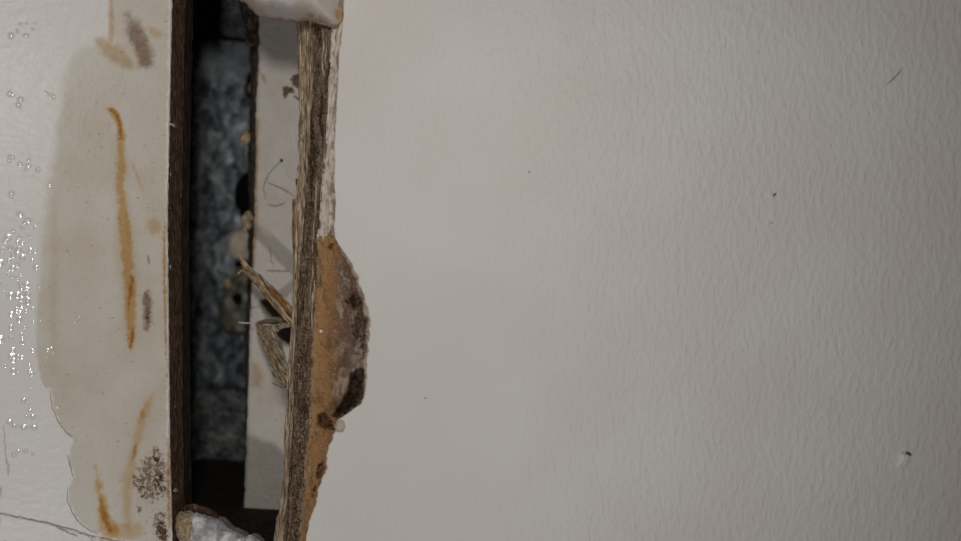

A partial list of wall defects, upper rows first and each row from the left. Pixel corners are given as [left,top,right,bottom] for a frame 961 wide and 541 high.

crack [0,513,116,541]
peeling [33,0,172,541]
spalling [244,15,259,433]
spalling [273,12,344,541]